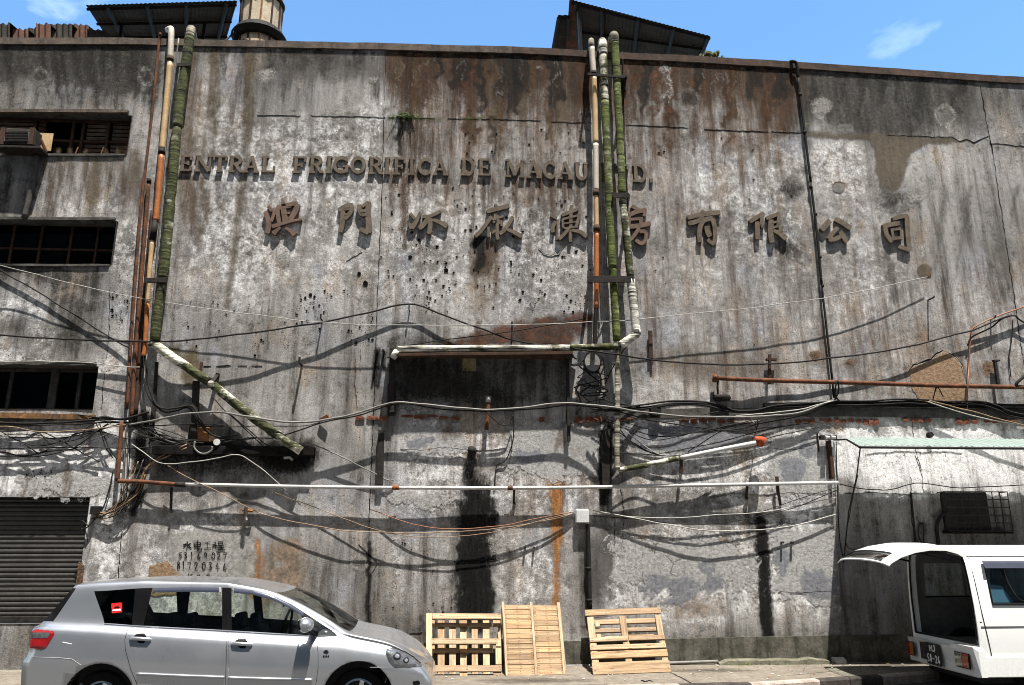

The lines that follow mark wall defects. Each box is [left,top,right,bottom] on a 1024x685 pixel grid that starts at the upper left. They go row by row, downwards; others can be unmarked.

corrosion [395,51,599,173]
corrosion [614,61,803,164]
leakage [806,74,979,213]
crack [894,87,1024,362]
corrosion [447,311,593,345]
spalling [910,351,966,402]
leakage [451,454,510,634]
corrosion [546,480,564,606]
leakage [744,513,790,637]